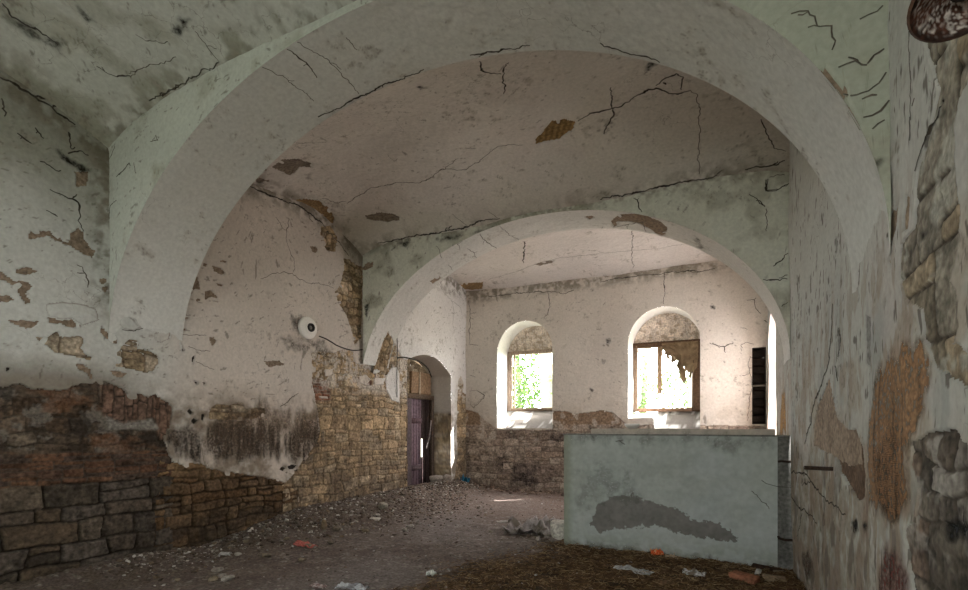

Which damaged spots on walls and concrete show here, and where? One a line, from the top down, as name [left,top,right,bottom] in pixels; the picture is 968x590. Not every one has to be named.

crack [0,77,136,232]
crack [149,31,220,101]
peeling [256,159,317,184]
crack [262,42,424,117]
crack [378,42,722,346]
peeling [535,119,575,144]
flaking render [610,214,668,235]
crack [791,10,945,172]
damp [169,400,319,464]
flaking render [0,199,654,590]
peeling [814,380,866,500]
flaking render [906,429,968,590]